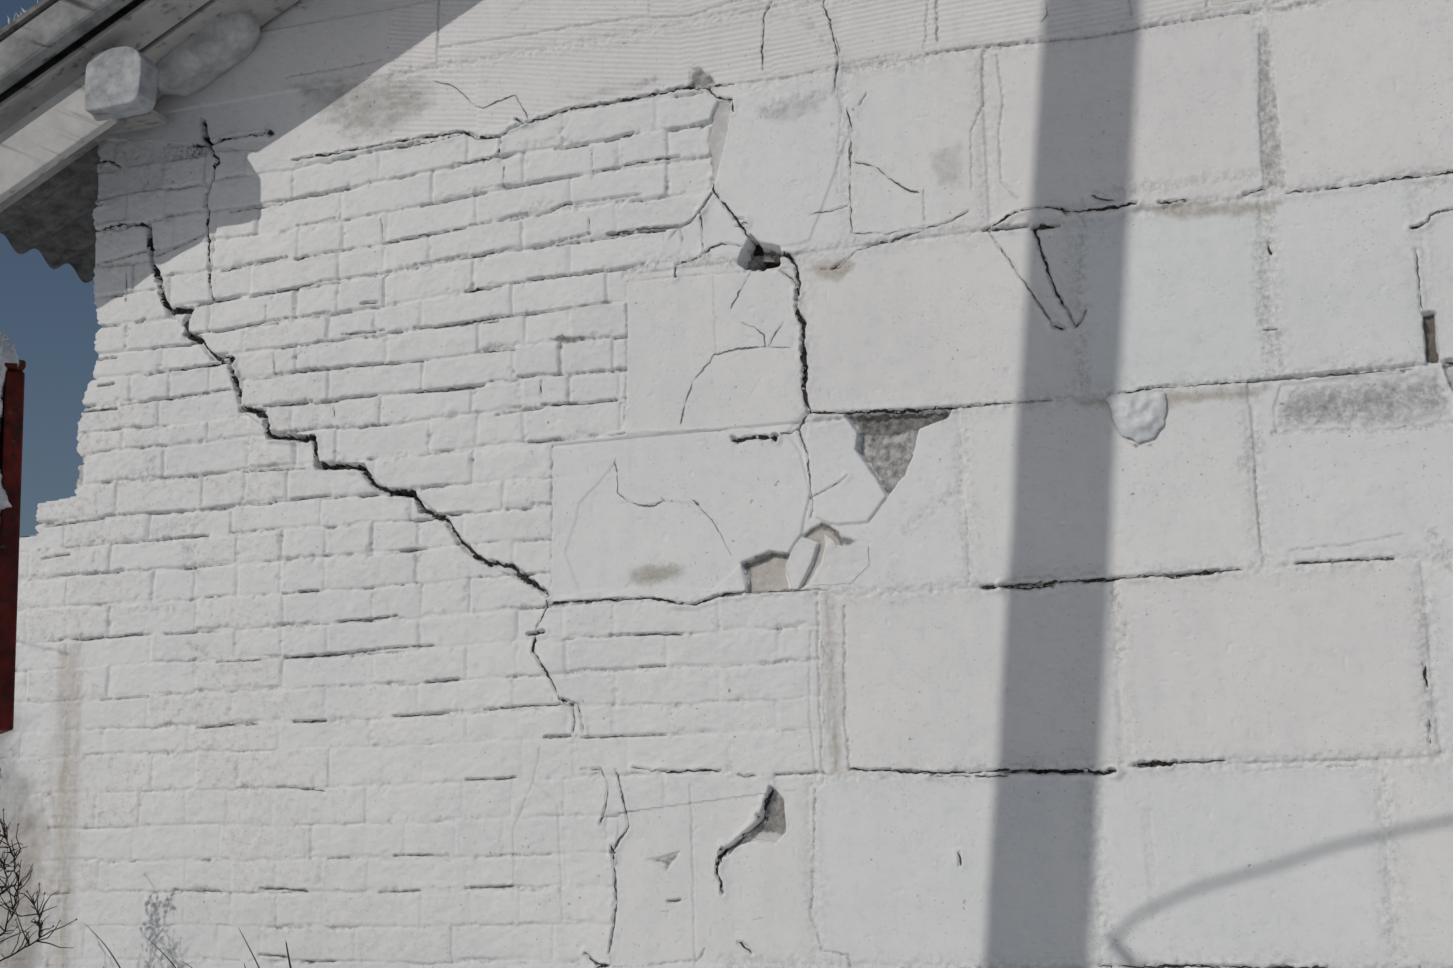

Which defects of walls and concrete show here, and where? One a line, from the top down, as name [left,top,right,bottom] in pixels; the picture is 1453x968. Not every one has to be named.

spalling [754,243,781,269]
crack [87,1,1241,968]
spalling [851,412,949,493]
flaking render [744,524,869,593]
spalling [726,790,786,856]